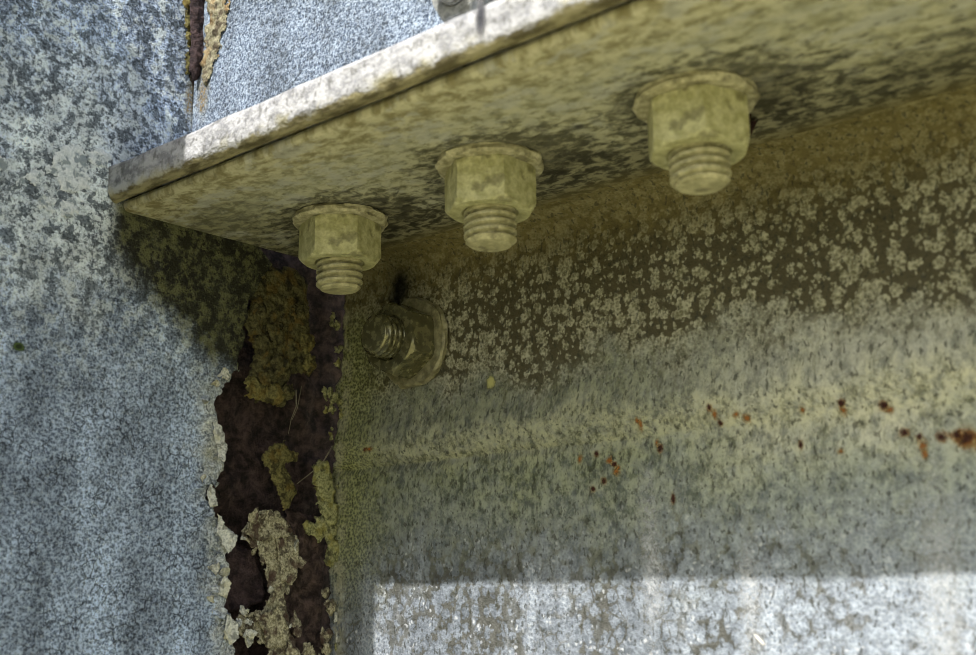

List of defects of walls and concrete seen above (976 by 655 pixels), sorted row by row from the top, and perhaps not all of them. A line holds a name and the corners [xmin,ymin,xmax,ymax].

crack [182,0,231,86]
corrosion [899,428,928,459]
corrosion [935,429,976,450]
corrosion [591,451,620,492]
peeling [302,520,323,543]